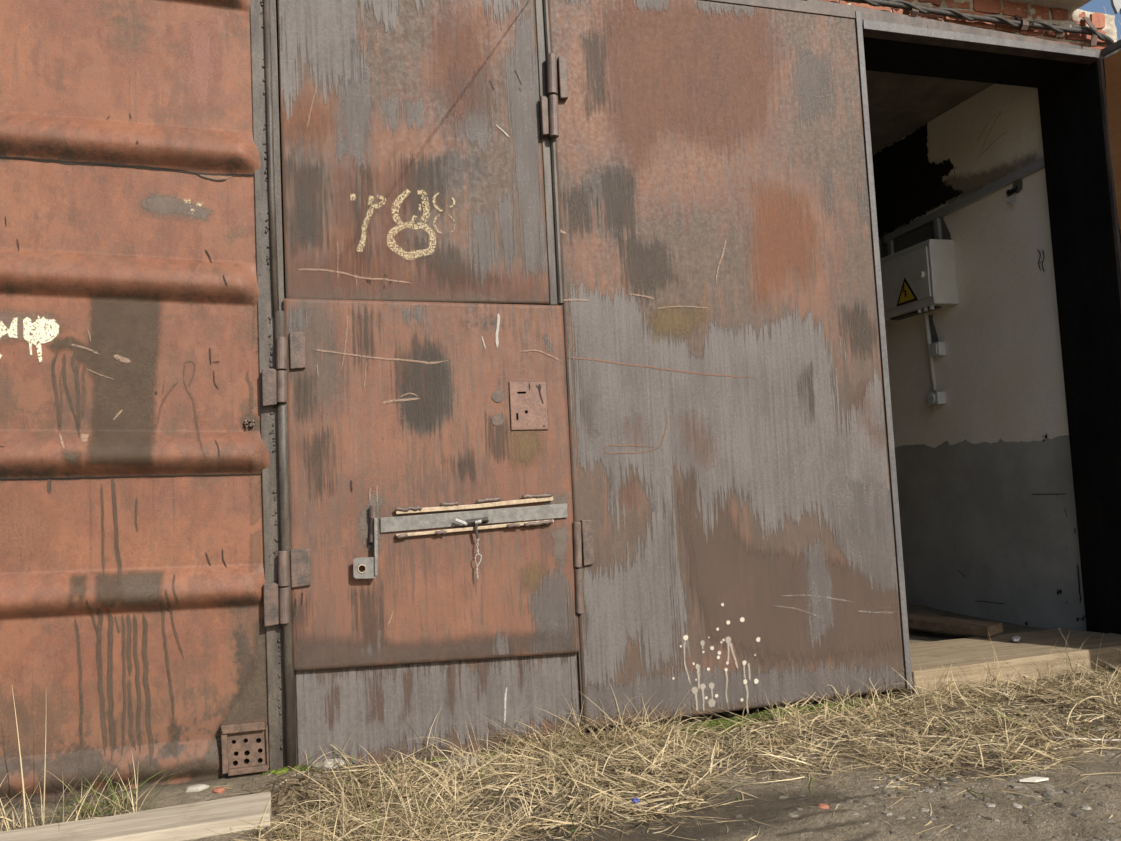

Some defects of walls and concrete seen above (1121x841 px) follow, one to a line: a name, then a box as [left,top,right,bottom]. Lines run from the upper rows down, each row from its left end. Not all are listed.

peeling [279,0,425,122]
peeling [466,0,547,291]
flaking render [1006,179,1023,207]
damp [71,478,201,781]
peeling [296,281,904,766]
rust [678,469,900,668]